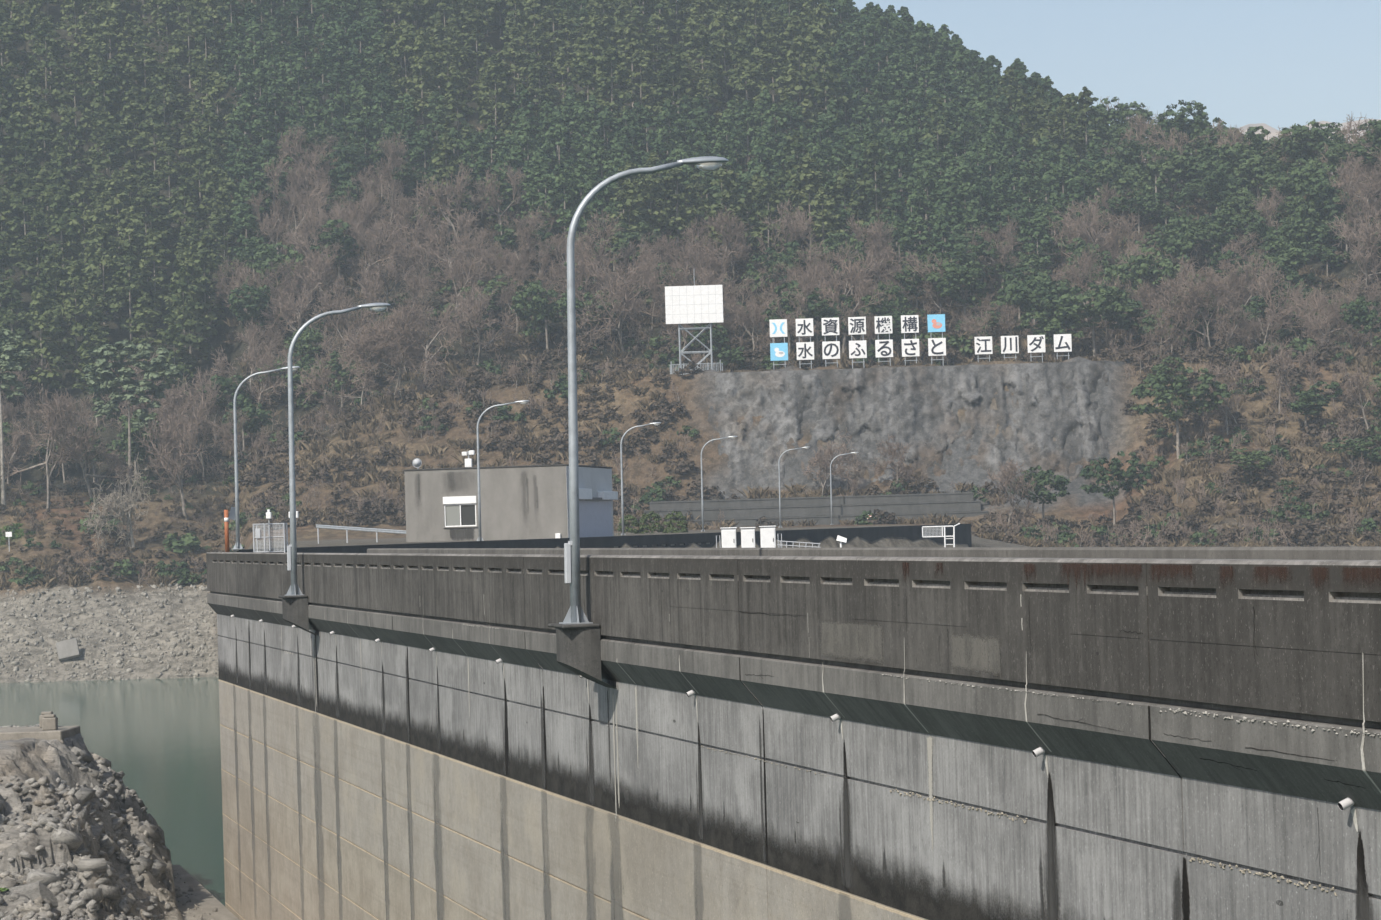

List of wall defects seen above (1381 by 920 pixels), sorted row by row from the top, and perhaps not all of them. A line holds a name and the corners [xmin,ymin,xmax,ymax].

rust [1061,563,1195,591]
rust [1253,566,1292,588]
rust [1310,566,1381,590]
leakage [218,607,1060,920]
leakage [1148,705,1181,777]
leakage [1360,653,1381,793]
leakage [1173,857,1190,920]
leakage [1351,807,1373,920]